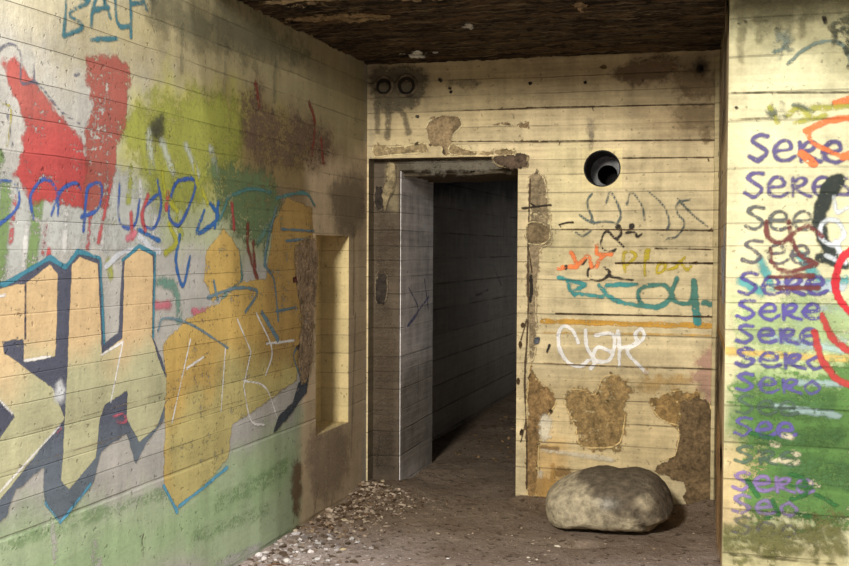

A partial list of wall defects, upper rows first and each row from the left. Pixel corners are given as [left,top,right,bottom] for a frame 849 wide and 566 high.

peeling [259,0,393,24]
leakage [369,66,428,140]
leakage [612,20,724,159]
peeling [371,115,634,497]
spalling [649,389,720,504]